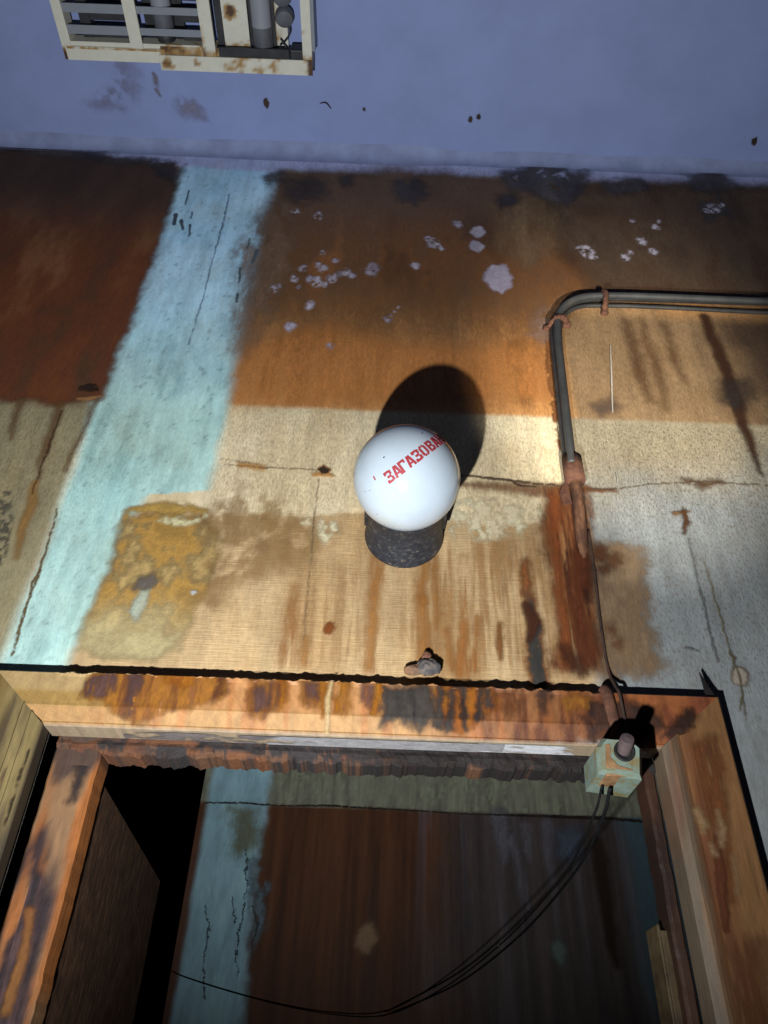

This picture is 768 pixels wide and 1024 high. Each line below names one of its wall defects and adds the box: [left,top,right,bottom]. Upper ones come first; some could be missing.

leakage [491,167,768,298]
crack [188,195,229,345]
crack [461,475,560,488]
crack [599,481,768,490]
peeling [81,502,221,660]
rust [461,483,617,677]
rust [81,673,276,744]
peeling [266,736,574,755]
rust [538,690,696,742]